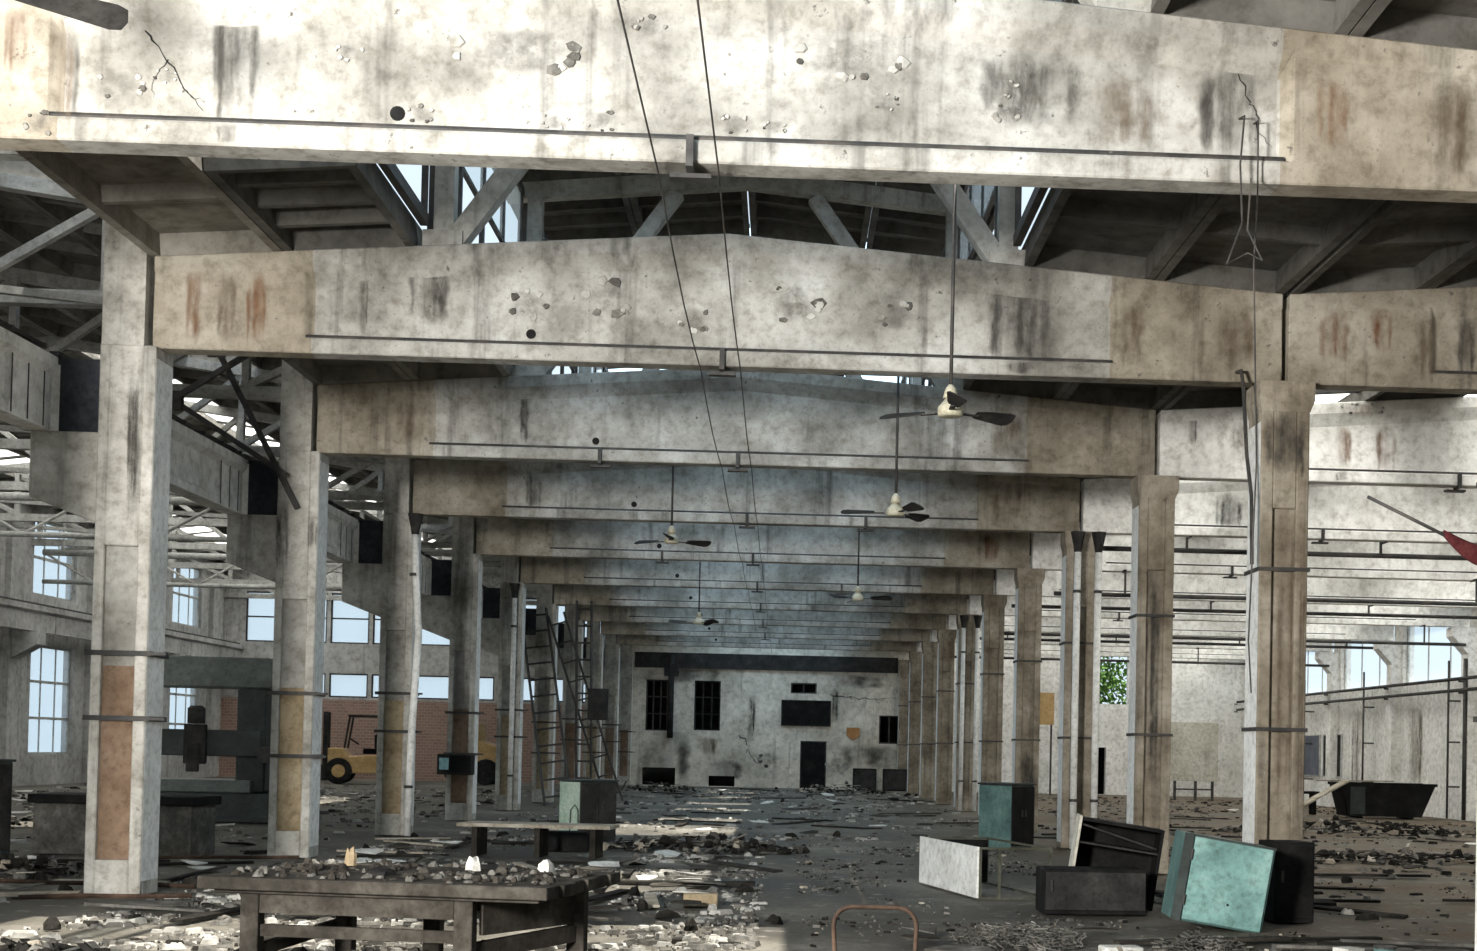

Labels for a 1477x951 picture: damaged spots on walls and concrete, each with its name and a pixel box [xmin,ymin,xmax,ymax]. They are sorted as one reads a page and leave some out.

crack [145,30,203,111]
peeling [449,35,466,60]
peeling [546,41,582,76]
water stain [1201,75,1235,138]
water stain [992,297,1047,351]